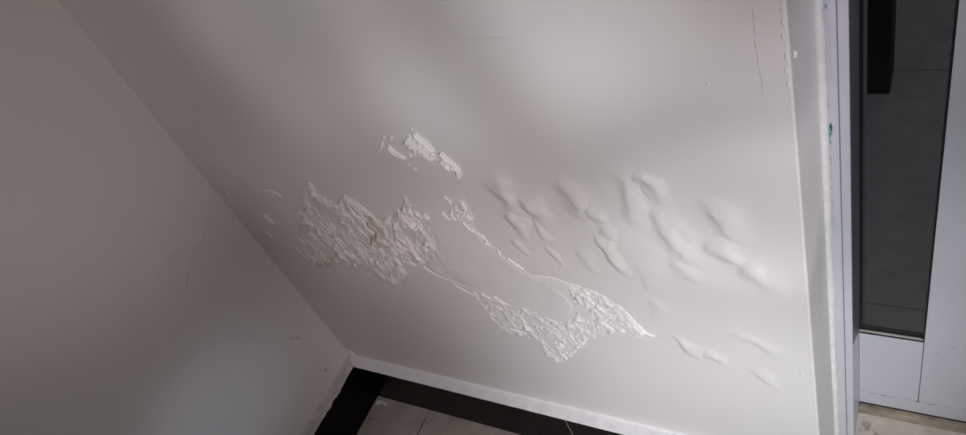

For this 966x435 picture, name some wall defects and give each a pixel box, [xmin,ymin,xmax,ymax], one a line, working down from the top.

peeling [377,128,462,179]
flaking render [293,178,645,364]